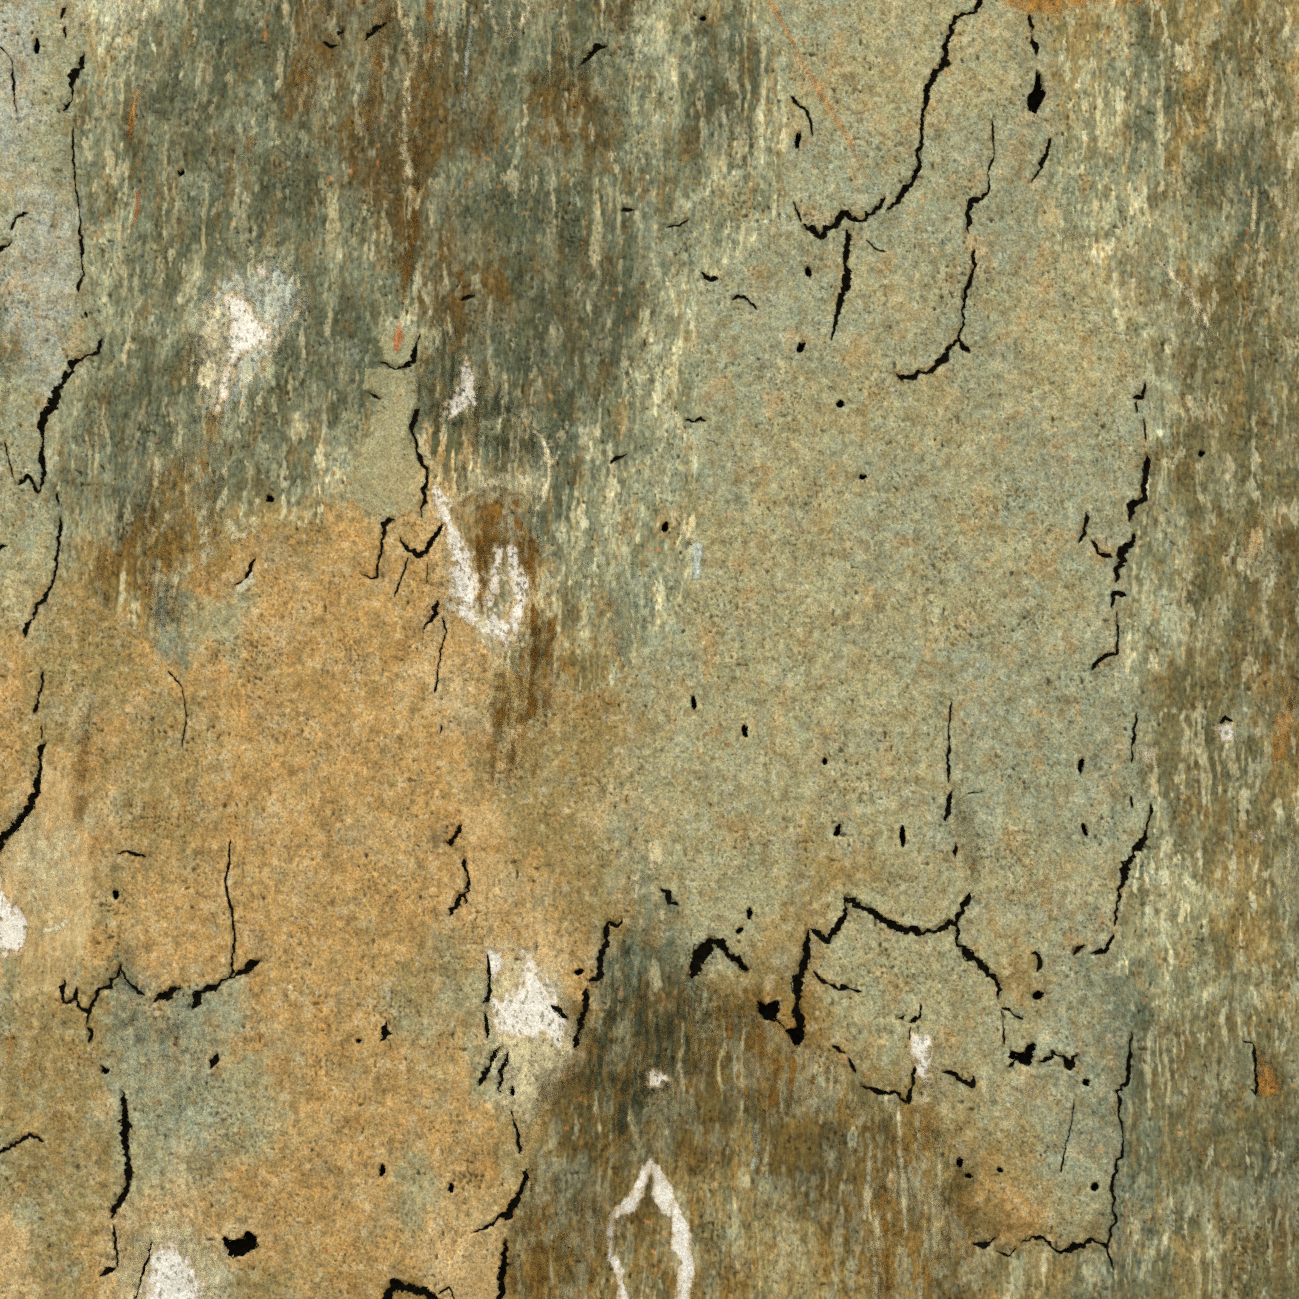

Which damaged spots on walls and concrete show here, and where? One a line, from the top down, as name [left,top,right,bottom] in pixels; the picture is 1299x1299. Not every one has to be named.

crack [791,0,982,340]
crack [0,7,102,638]
leakage [198,262,305,415]
leakage [418,331,558,656]
crack [1079,382,1151,670]
leakage [0,810,80,959]
crack [59,839,260,1043]
crack [472,954,529,1299]
leakage [484,942,575,1128]
leakage [607,1158,695,1299]
leakage [910,1032,934,1100]
crack [790,893,1078,1105]